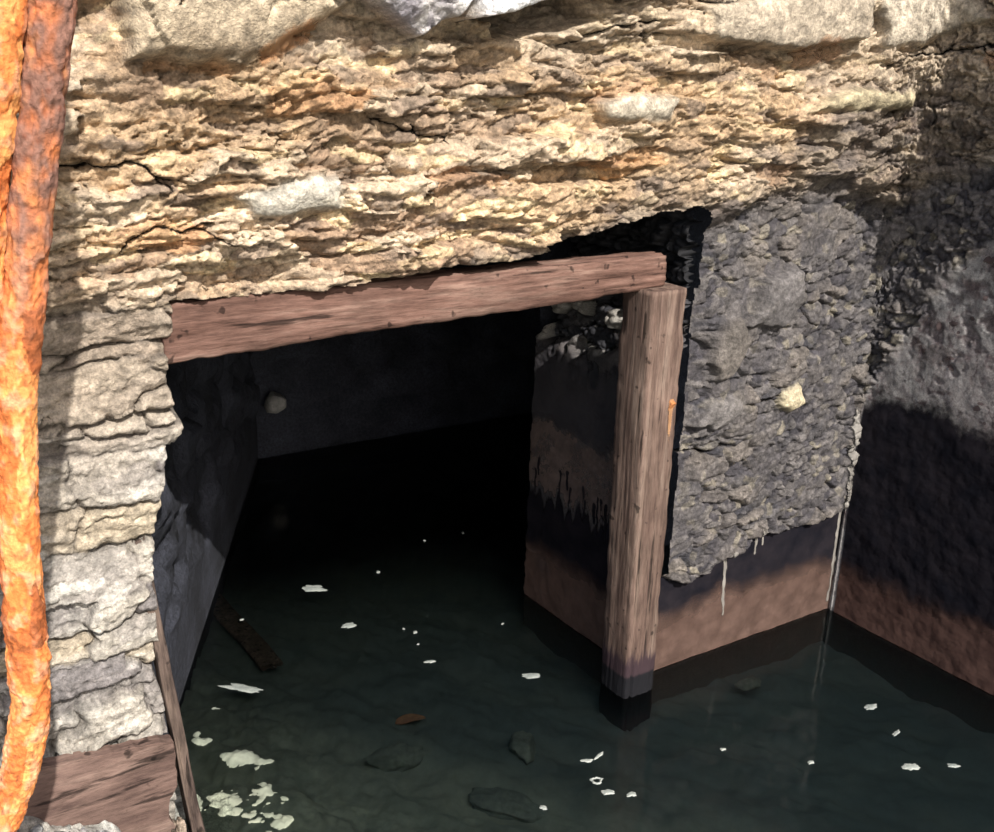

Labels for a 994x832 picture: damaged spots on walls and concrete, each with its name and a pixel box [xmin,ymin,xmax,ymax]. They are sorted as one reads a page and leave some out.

crack [59,161,179,192]
damp [525,486,609,595]
damp [658,390,994,630]